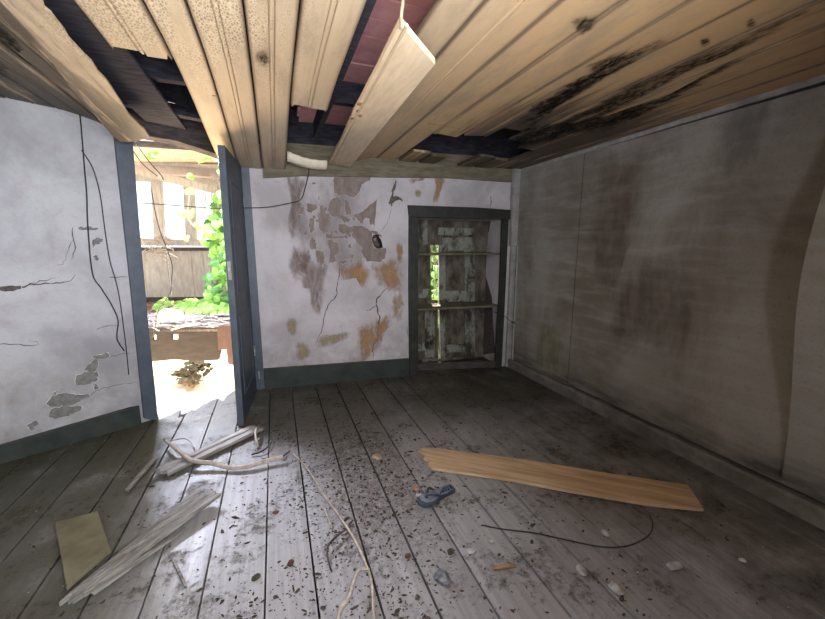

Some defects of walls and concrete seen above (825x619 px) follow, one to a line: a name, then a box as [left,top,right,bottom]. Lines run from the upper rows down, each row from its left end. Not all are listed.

damp [491,18,784,151]
flaking render [295,177,387,266]
flaking render [388,179,403,207]
crack [22,228,76,288]
crack [316,265,340,343]
crack [367,288,387,357]
spalling [46,352,110,420]